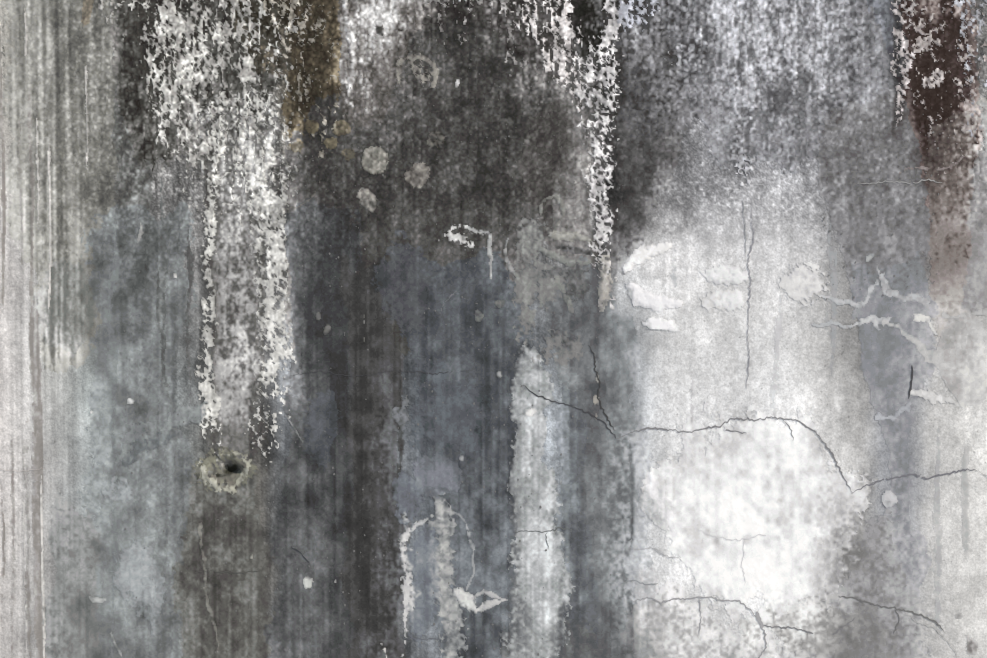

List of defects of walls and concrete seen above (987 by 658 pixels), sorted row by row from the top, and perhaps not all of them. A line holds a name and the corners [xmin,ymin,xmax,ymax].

spalling [191,446,259,495]
leakage [0,0,622,658]
leakage [545,264,822,658]
crack [525,346,987,493]
crack [621,530,957,658]
leakage [597,0,987,658]
corrosion [898,0,984,336]